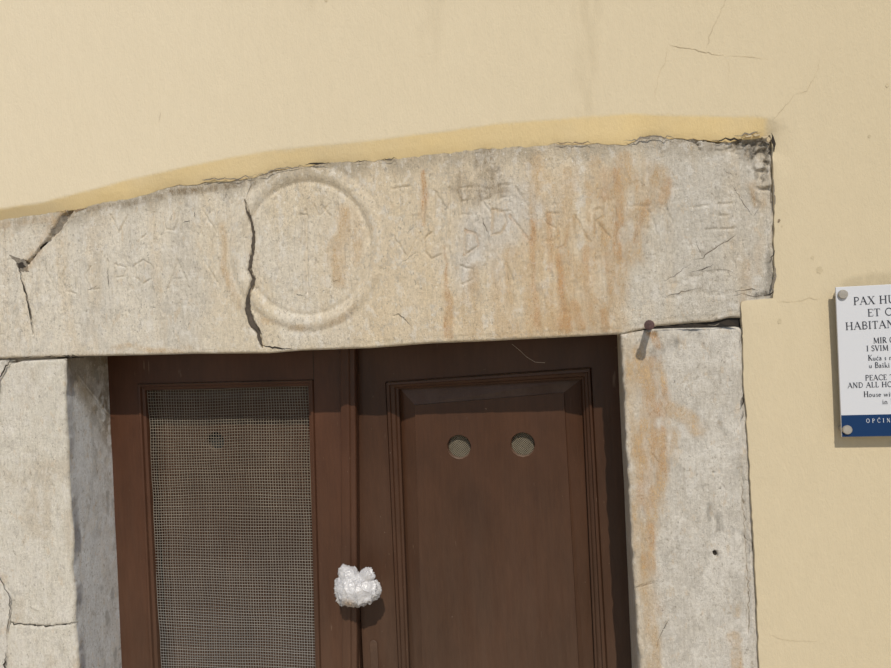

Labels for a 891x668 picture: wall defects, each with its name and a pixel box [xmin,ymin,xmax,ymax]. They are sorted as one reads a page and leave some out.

crack [205,162,329,349]
crack [0,579,66,668]